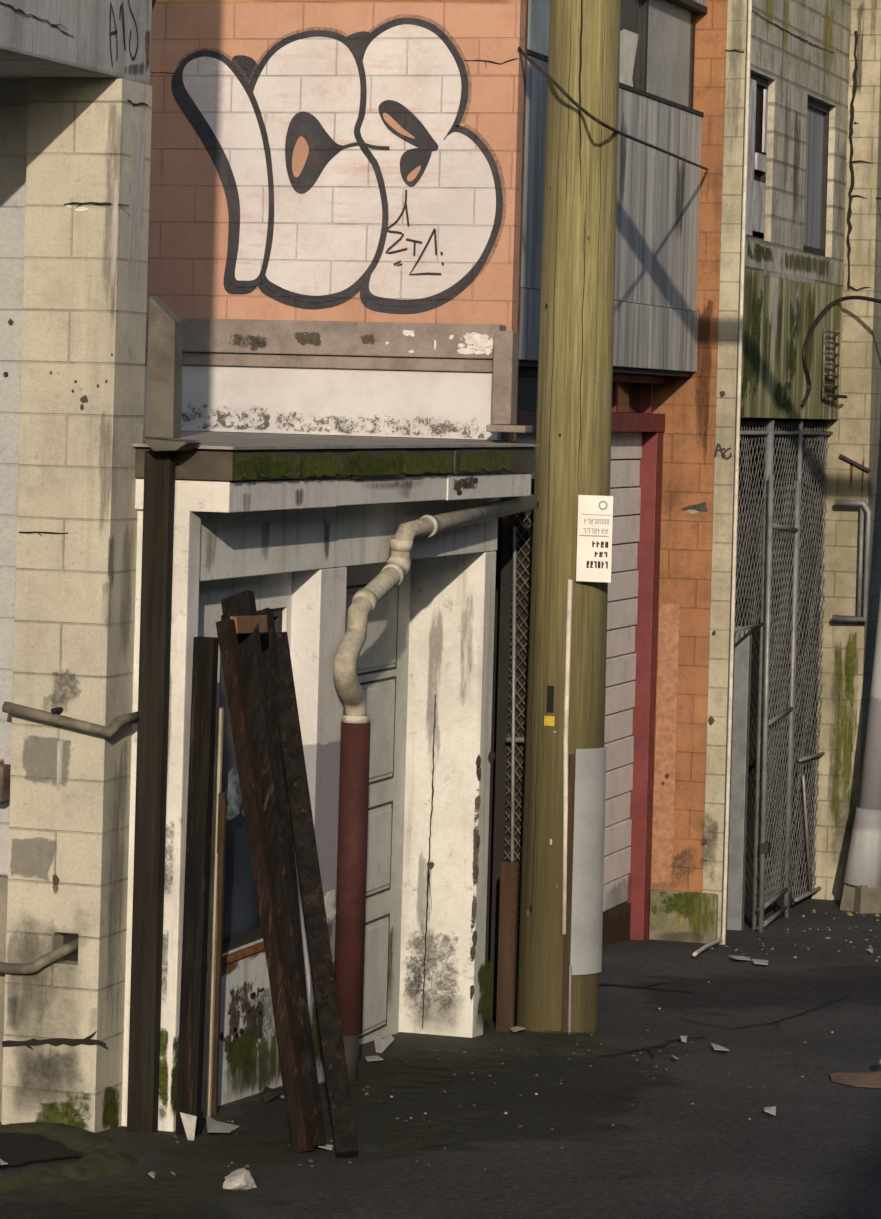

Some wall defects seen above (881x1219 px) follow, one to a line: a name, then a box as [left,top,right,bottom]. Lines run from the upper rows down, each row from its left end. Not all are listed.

crack [0,1,74,37]
crack [752,10,873,291]
peeling [434,332,494,356]
leakage [758,269,813,379]
peeling [181,404,485,438]
peeling [470,751,495,961]
leakage [406,936,457,997]
crack [2,1031,106,1050]